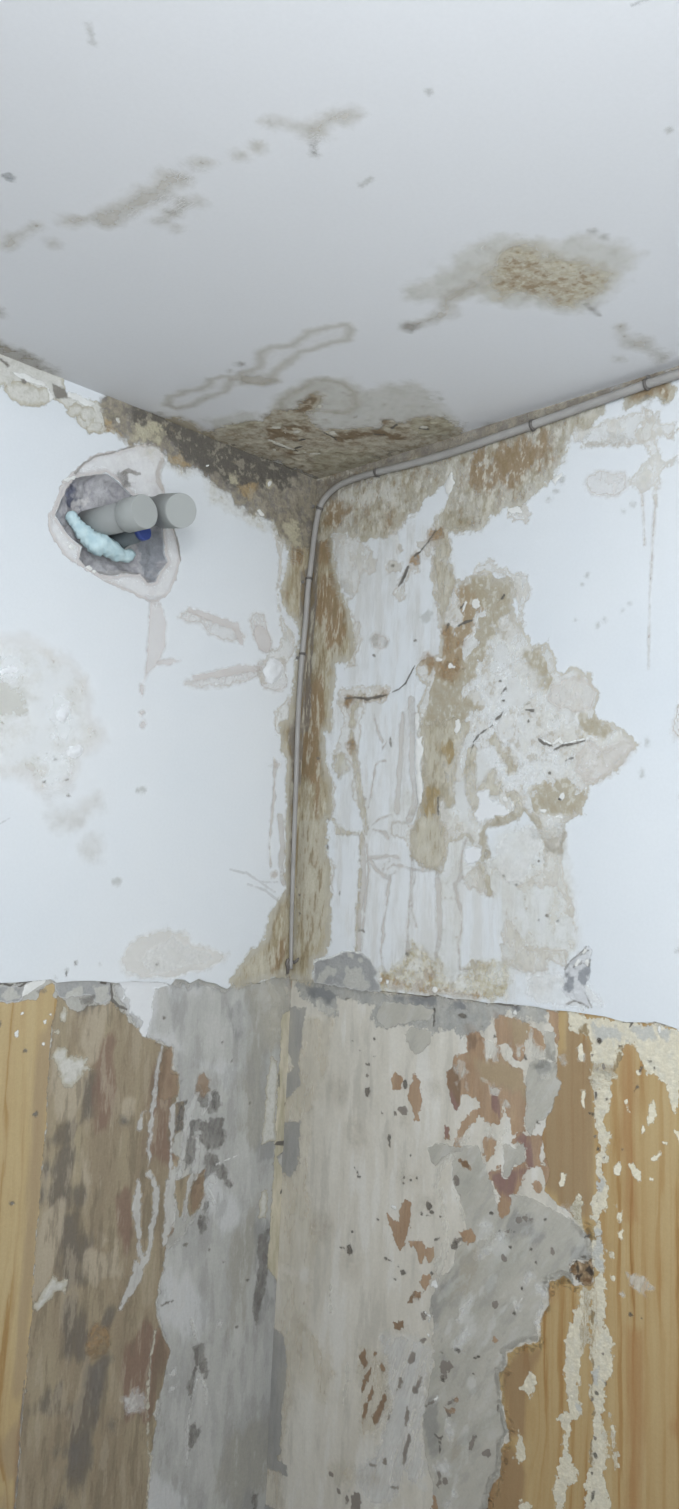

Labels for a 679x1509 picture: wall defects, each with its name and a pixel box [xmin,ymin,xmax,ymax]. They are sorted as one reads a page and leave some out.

leakage [490,247,607,306]
spalling [0,354,181,602]
leakage [101,366,679,998]
spalling [0,981,32,1004]
spalling [55,946,679,1509]